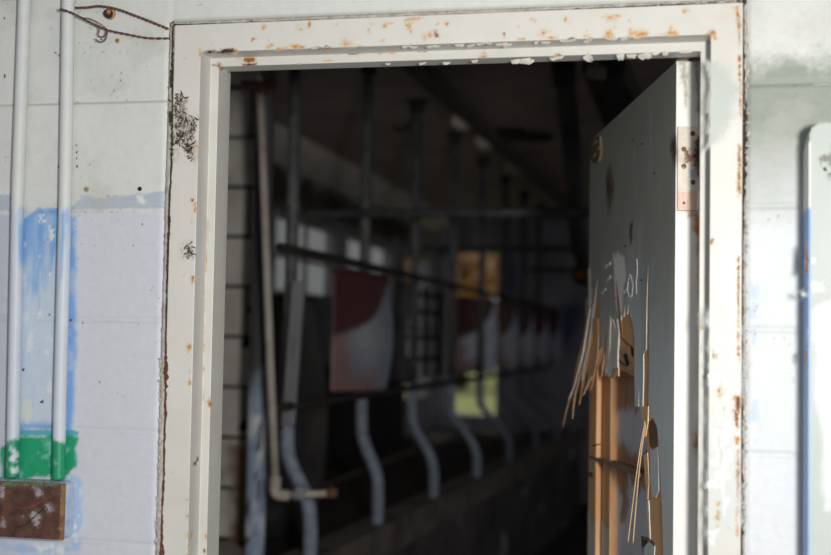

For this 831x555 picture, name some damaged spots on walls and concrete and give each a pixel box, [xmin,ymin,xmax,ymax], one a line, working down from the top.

corrosion [250,23,396,62]
corrosion [403,16,450,53]